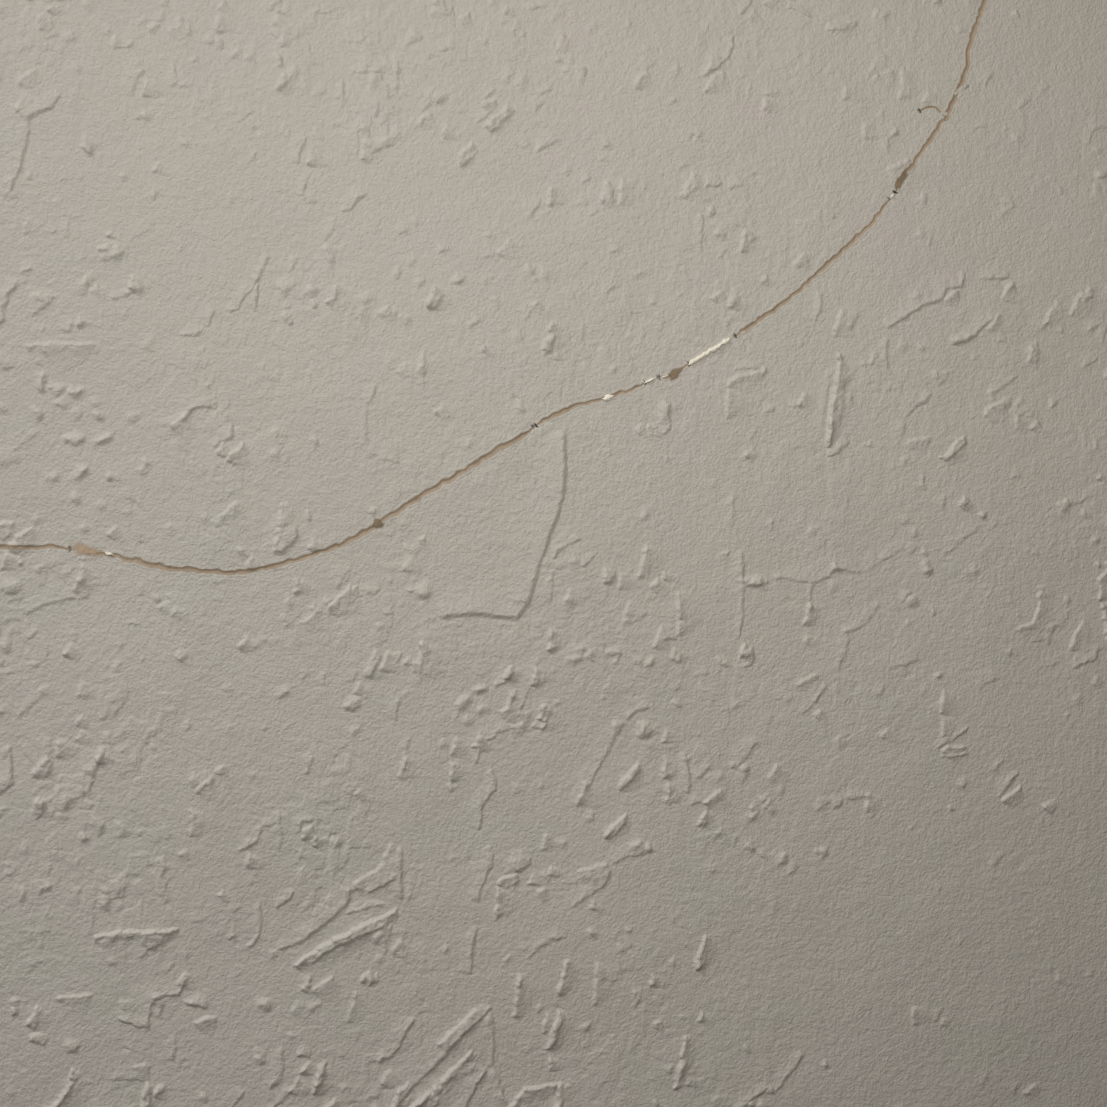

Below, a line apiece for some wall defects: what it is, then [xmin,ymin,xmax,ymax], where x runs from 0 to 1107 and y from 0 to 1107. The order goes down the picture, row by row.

crack [0,0,990,578]